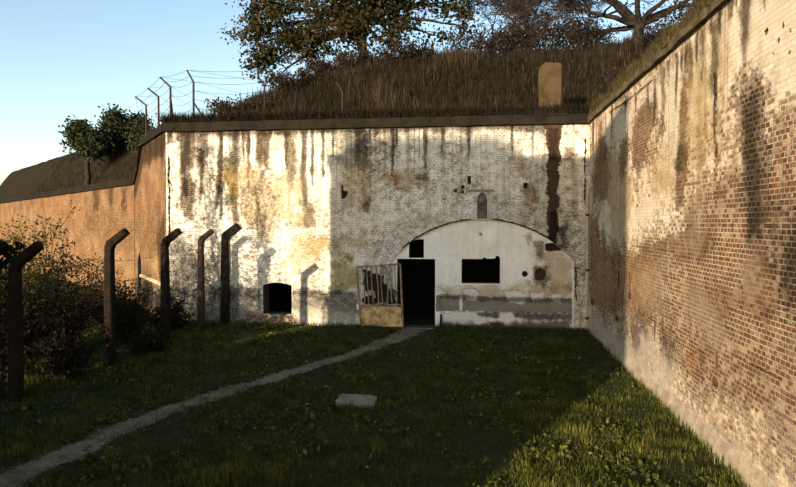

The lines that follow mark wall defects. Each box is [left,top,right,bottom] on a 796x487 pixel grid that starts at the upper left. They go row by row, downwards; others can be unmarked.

leakage [647,0,751,125]
leakage [284,129,334,204]
leakage [354,130,370,173]
leakage [390,129,398,174]
leakage [537,124,564,256]
peeling [441,288,562,326]
spalling [522,268,546,281]
peeling [589,63,796,483]